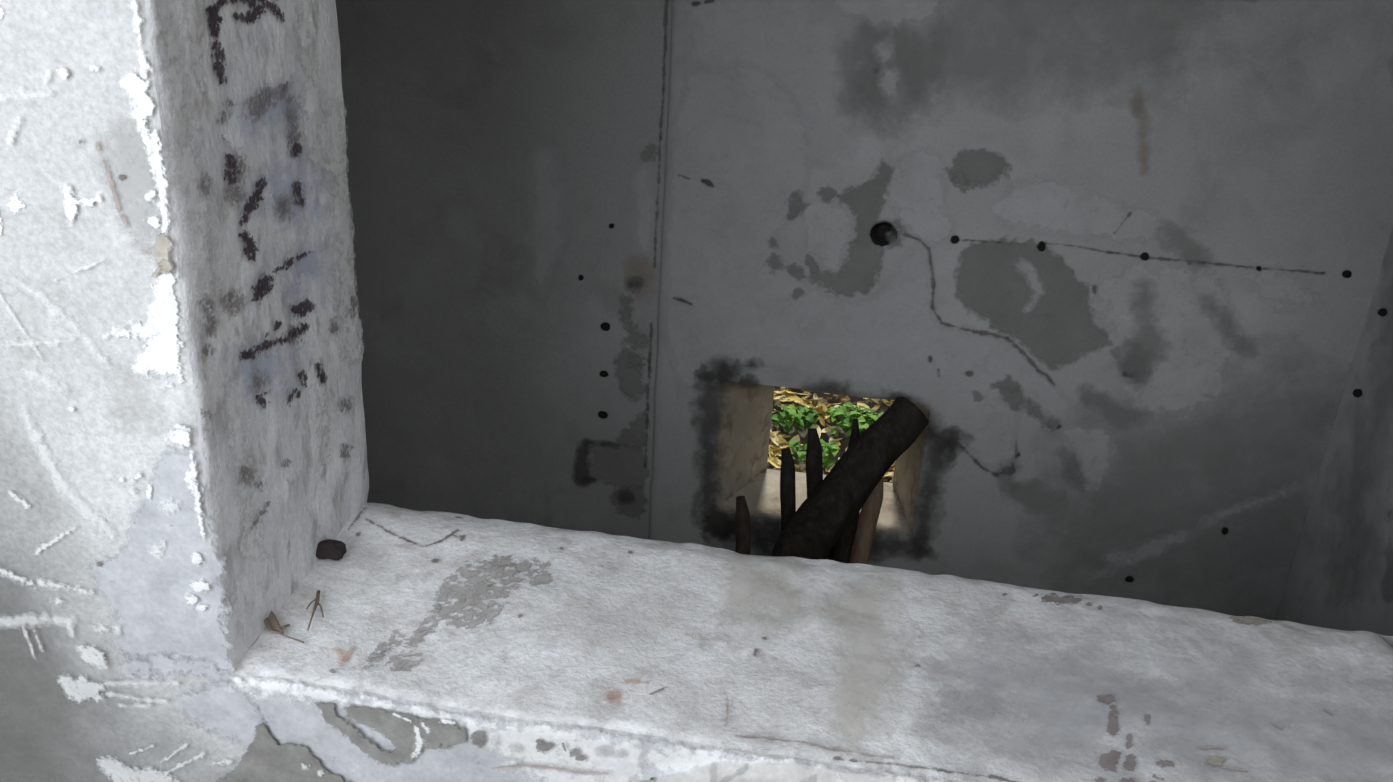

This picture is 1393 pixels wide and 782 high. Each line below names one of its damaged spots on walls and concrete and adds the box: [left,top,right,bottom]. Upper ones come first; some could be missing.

peeling [79,0,246,389]
peeling [293,8,364,362]
peeling [769,162,892,299]
peeling [948,149,1007,190]
crack [903,233,1054,385]
peeling [957,239,1111,369]
crack [966,240,1325,274]
peeling [164,380,270,611]
peeling [362,554,552,672]
peeling [217,673,963,782]
peeling [1095,694,1175,782]